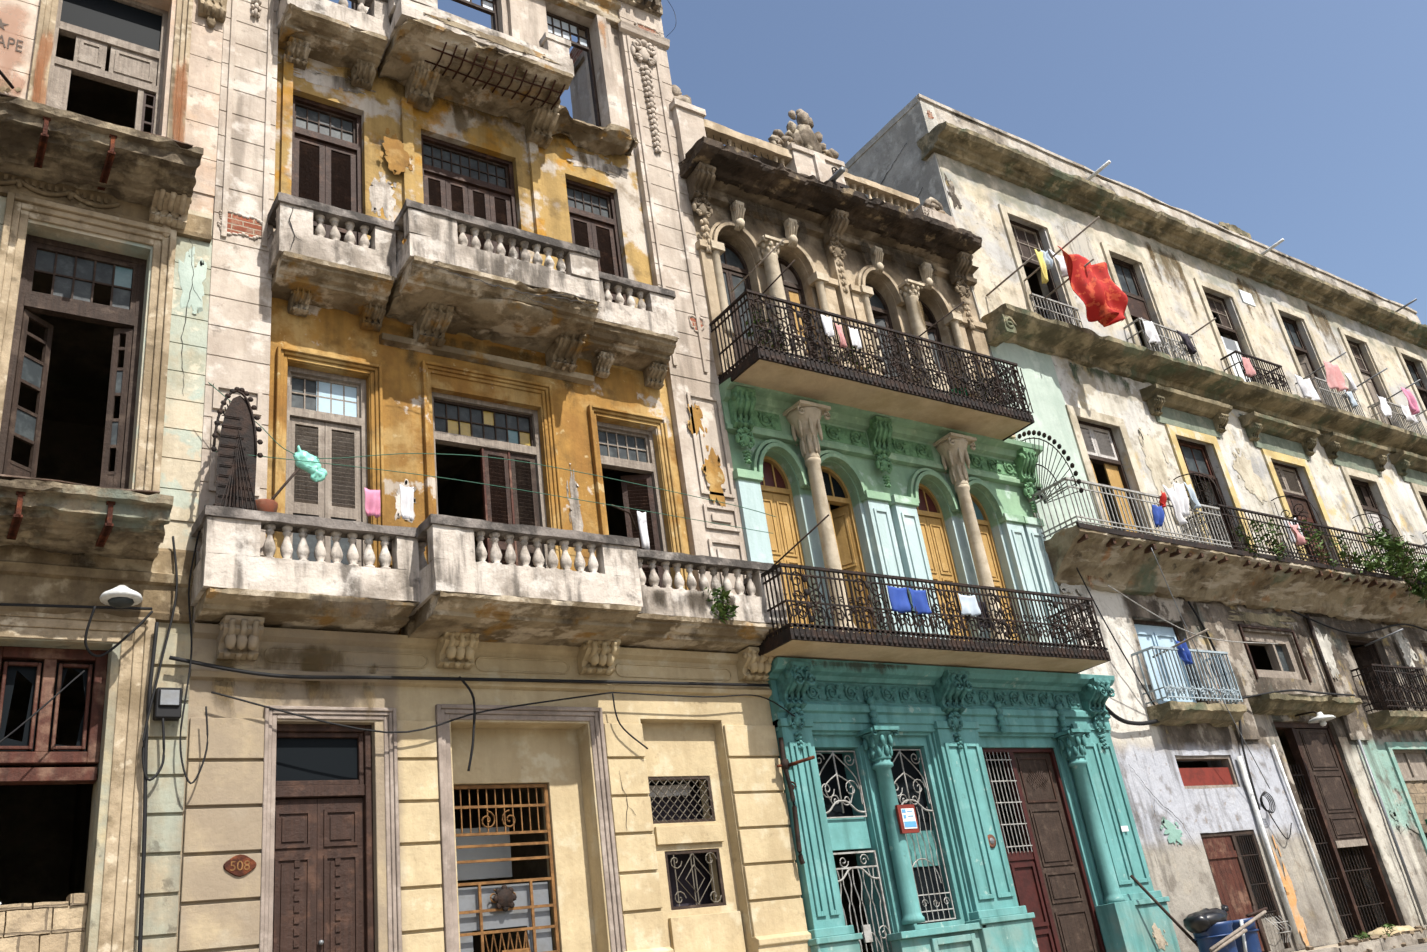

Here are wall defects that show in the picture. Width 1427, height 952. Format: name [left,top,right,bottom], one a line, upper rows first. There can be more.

rust [33,34,53,104]
peeling [369,128,413,222]
flaking render [217,210,271,240]